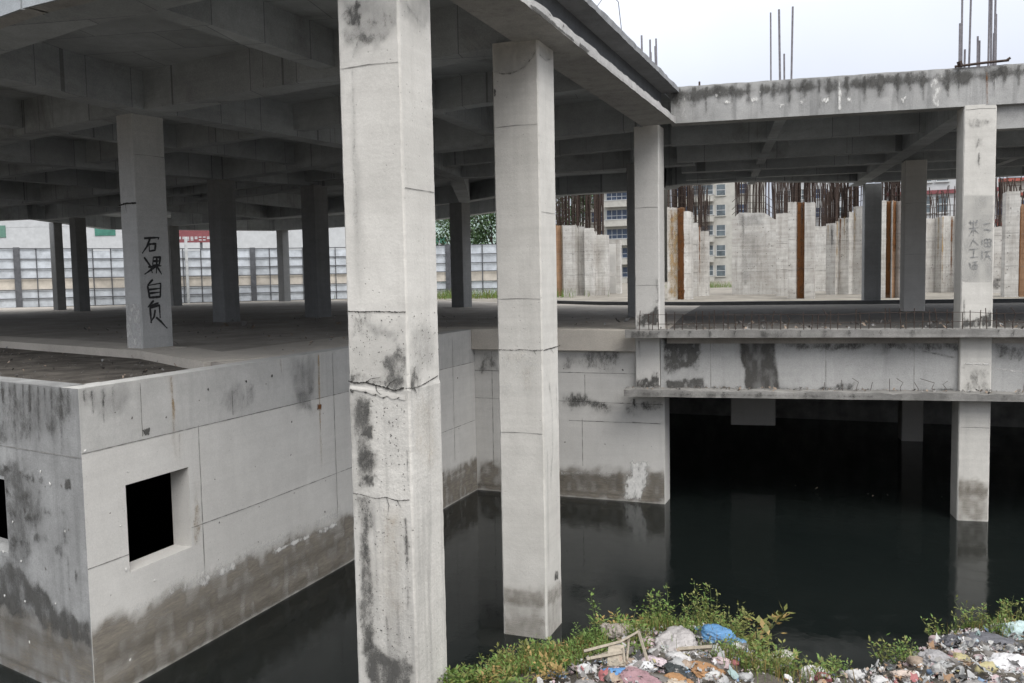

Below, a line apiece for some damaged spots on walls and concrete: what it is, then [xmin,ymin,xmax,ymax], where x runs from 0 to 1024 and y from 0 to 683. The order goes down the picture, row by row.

leakage [348,1,369,41]
leakage [671,64,1021,110]
corrosion [669,208,685,299]
corrosion [797,203,805,298]
leakage [1,383,68,433]
crack [348,376,437,395]
leakage [568,394,607,409]
leakage [632,306,723,410]
leakage [734,331,779,396]
leakage [442,458,501,508]
leakage [559,469,665,502]
leakage [0,395,412,683]